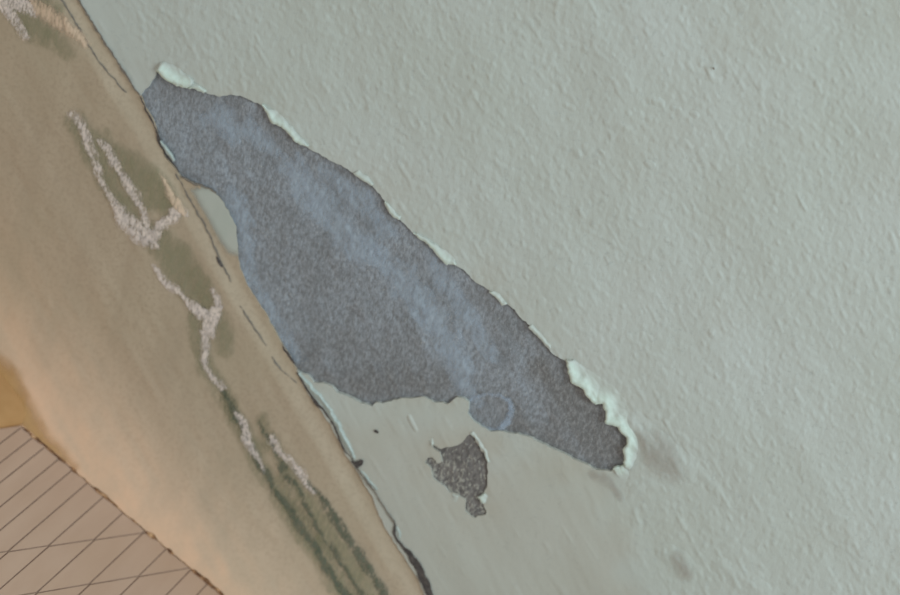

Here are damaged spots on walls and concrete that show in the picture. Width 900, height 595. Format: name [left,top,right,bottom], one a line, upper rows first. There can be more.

damp [69,111,188,249]
damp [152,265,388,595]
peeling [140,62,638,517]